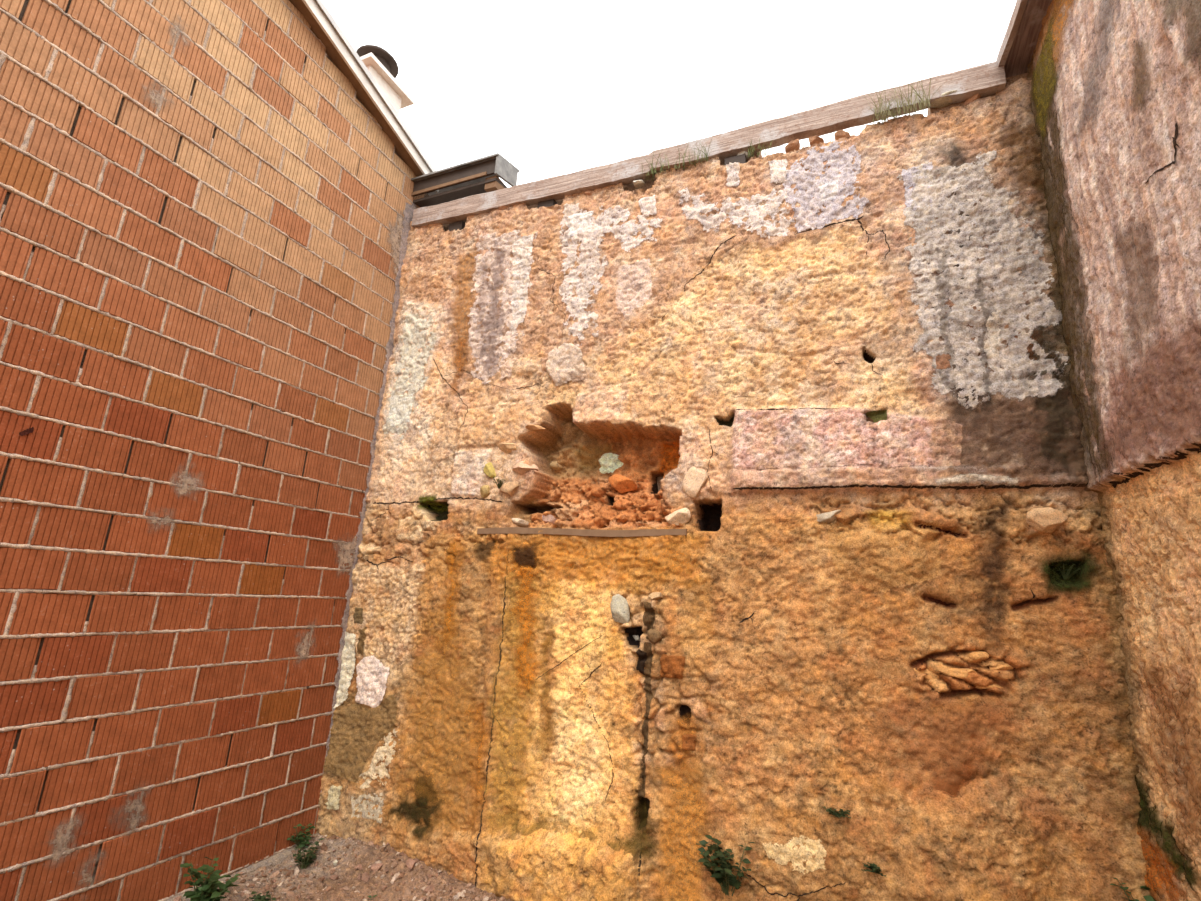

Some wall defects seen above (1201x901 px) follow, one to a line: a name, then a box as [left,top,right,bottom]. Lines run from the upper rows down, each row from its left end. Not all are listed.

peeling [467,229,537,385]
peeling [546,195,662,386]
spalling [656,140,882,397]
peeling [897,150,1068,409]
spalling [512,402,683,529]
peeling [876,417,1018,485]
crack [475,550,509,886]